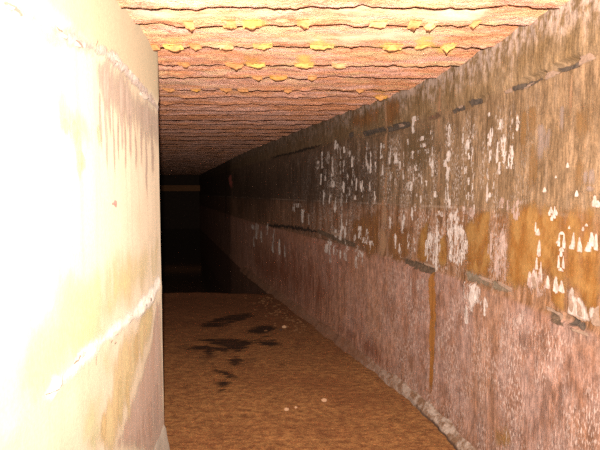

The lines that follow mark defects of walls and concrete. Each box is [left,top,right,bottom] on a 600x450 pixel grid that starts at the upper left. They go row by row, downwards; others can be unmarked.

leakage [97,62,158,183]
crack [269,224,317,232]
leakage [317,116,434,268]
efflorescence [425,124,476,272]
efflorescence [487,228,508,281]
efflorescence [486,119,514,201]
efflorescence [527,222,598,294]
leakage [584,170,600,207]
crack [45,277,161,400]
leakage [189,326,278,366]
rust [428,272,436,389]
efflorescence [463,282,488,324]